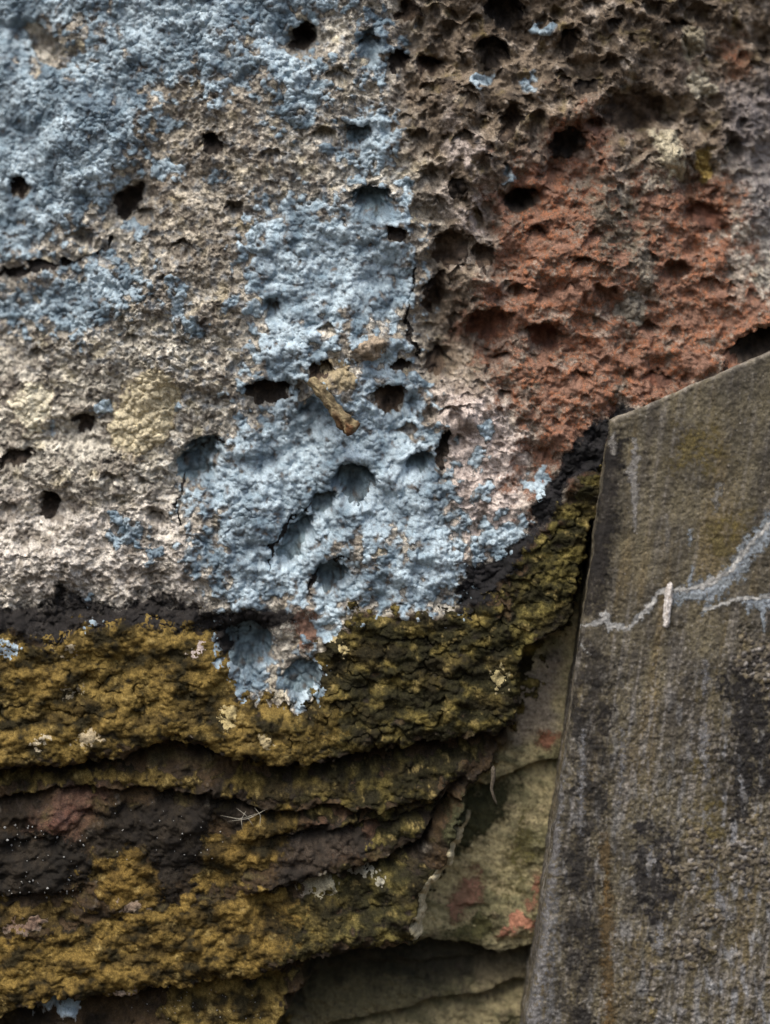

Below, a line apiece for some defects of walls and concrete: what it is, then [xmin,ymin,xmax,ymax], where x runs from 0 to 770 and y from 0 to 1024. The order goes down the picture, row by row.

spalling [0,0,770,713]
crack [403,267,421,359]
corrosion [449,96,770,521]
crack [267,502,311,569]
damp [0,578,297,661]
damp [69,727,106,752]
damp [216,705,237,733]
damp [697,659,770,819]
damp [0,830,92,898]
damp [95,788,220,913]
damp [269,818,386,899]
damp [525,635,626,1024]